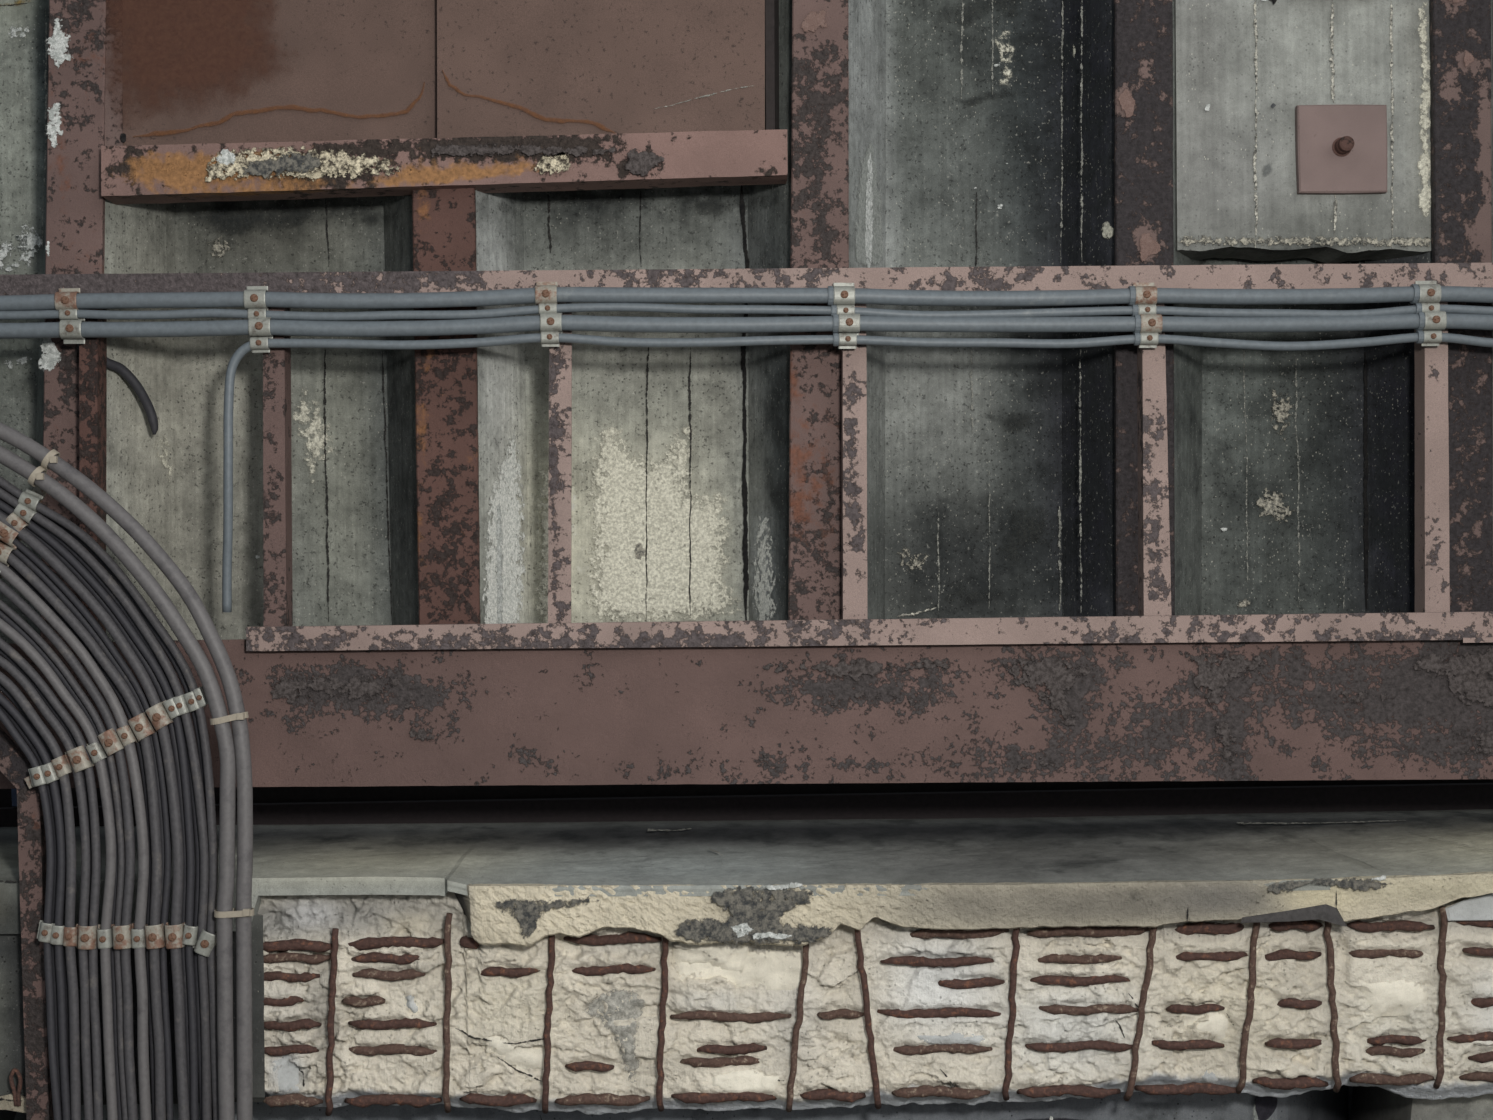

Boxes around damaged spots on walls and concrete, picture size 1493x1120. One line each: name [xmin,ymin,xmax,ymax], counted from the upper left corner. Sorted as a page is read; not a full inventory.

corrosion [106,0,765,146]
leakage [995,31,1014,83]
leakage [0,224,43,272]
leakage [855,142,884,268]
peeling [1412,646,1493,709]
spalling [258,891,1493,1120]